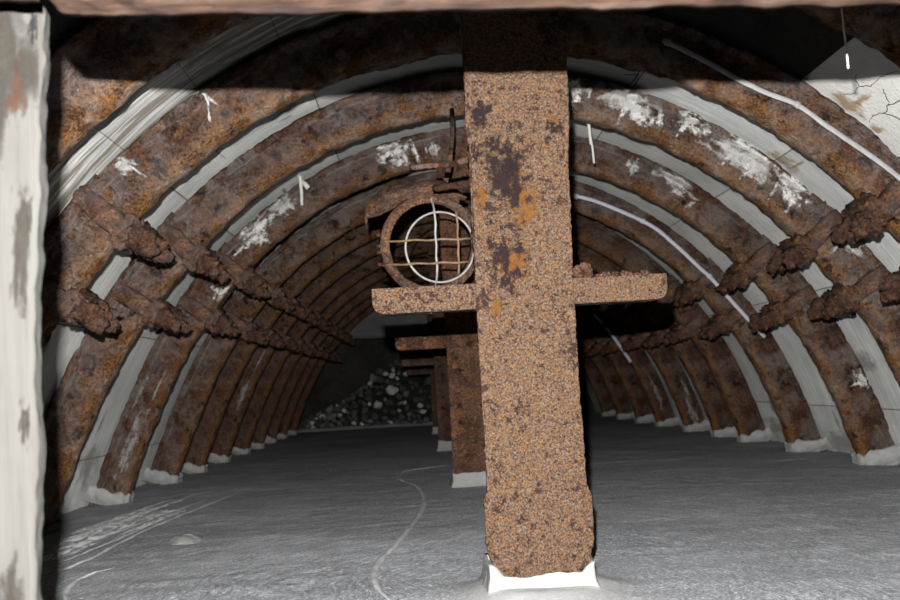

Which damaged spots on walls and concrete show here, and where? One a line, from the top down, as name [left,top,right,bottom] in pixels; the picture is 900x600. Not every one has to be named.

corrosion [545,114,565,139]
water stain [568,78,592,106]
water stain [602,89,663,125]
water stain [676,111,711,137]
corrosion [835,95,867,116]
crack [844,71,900,122]
water stain [115,158,140,175]
water stain [377,139,439,166]
water stain [708,134,811,206]
water stain [652,171,695,206]
water stain [234,197,294,255]
corrosion [471,100,542,317]